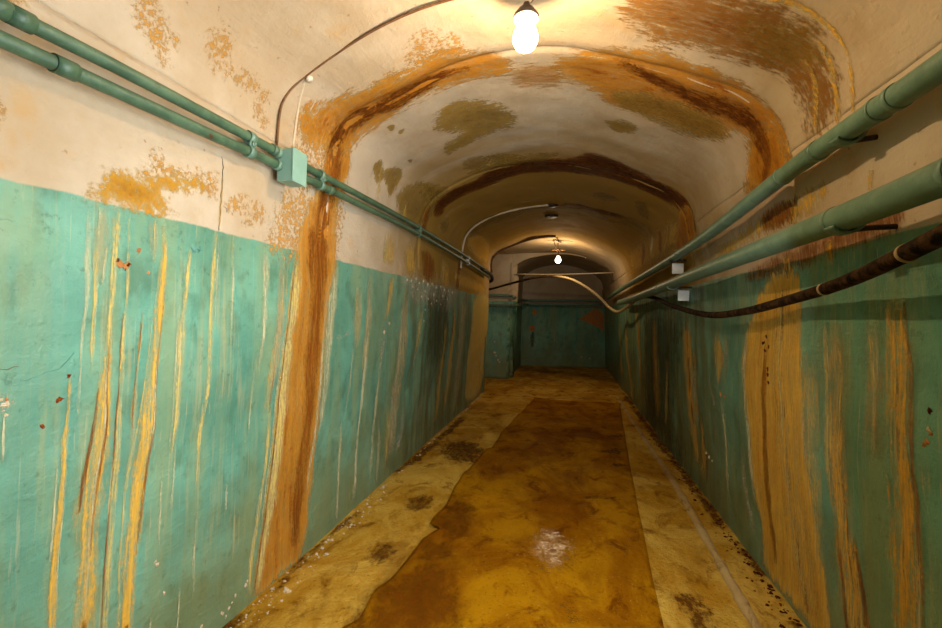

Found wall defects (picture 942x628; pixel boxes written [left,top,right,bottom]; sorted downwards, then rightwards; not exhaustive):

leakage [433,99,516,153]
corrosion [87,0,855,596]
leakage [352,502,475,628]
leakage [407,495,433,511]
leakage [674,594,714,628]
corrosion [742,213,904,628]
corrosion [866,305,924,628]